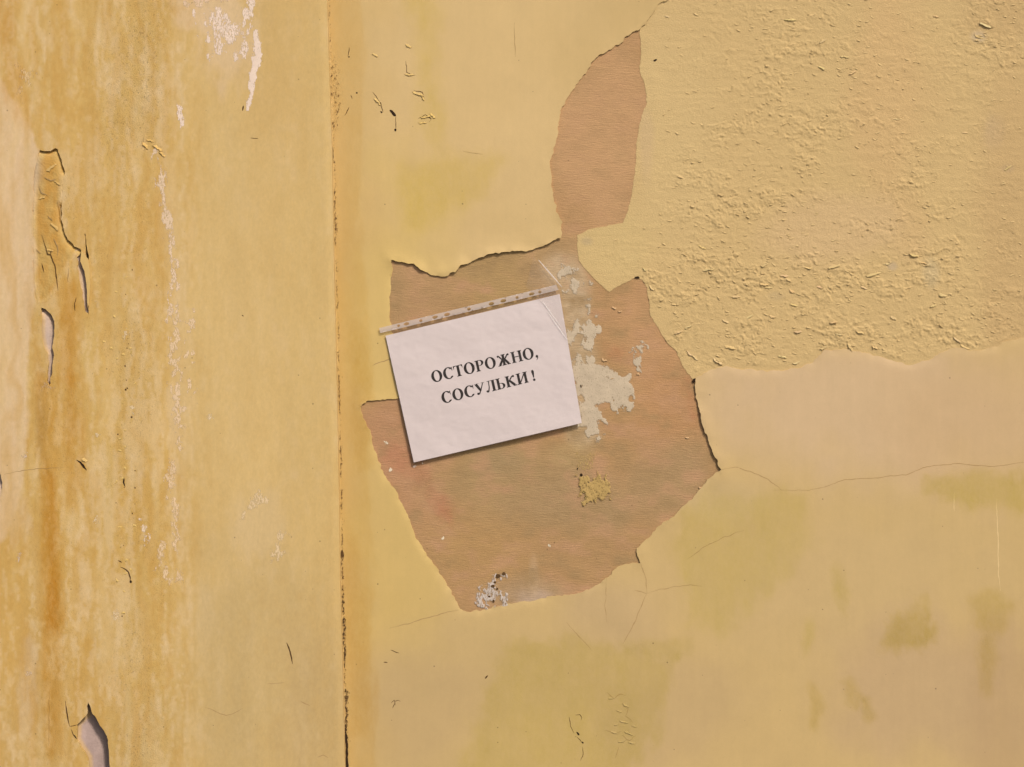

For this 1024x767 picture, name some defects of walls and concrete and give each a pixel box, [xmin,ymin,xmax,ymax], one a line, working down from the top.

damp [183,0,263,111]
flaking render [32,149,90,384]
efflorescence [139,148,198,585]
peeling [361,0,1024,612]
crack [722,462,1023,491]
spalling [78,703,110,767]